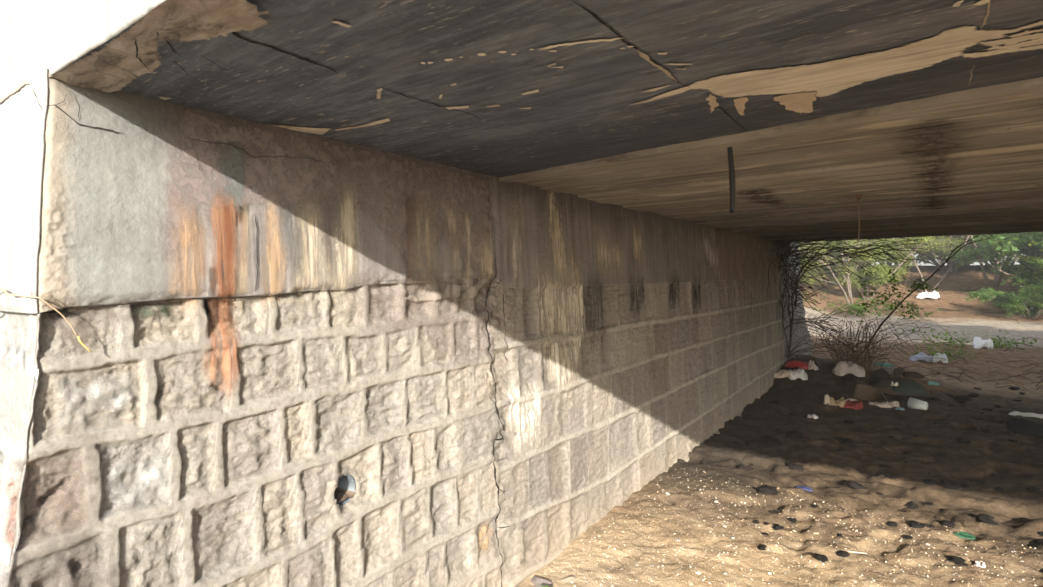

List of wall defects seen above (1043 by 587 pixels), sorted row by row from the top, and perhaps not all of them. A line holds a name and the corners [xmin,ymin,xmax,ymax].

spalling [48,0,269,93]
crack [231,32,337,73]
crack [572,0,688,87]
peeling [631,21,1043,116]
crack [49,93,125,134]
peeling [273,118,390,135]
leakage [904,124,963,209]
corrosion [175,197,238,388]
crack [485,220,509,587]